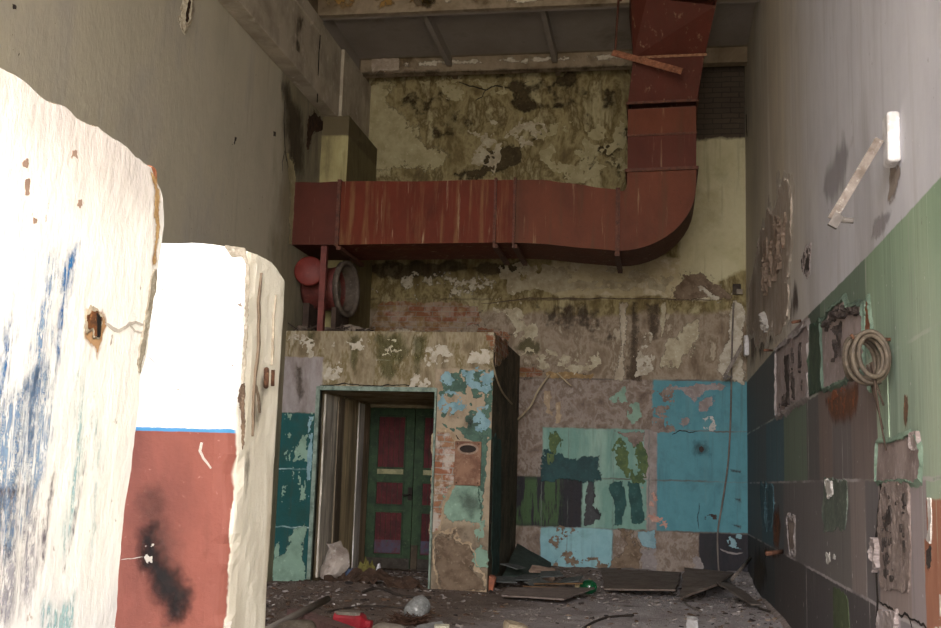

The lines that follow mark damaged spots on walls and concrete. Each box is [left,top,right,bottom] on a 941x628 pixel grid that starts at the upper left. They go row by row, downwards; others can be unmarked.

spalling [178,0,193,35]
leakage [401,59,482,75]
leakage [497,54,622,113]
leakage [401,92,450,114]
leakage [454,145,522,180]
crack [105,321,144,334]
flaking render [287,169,874,592]
crack [874,484,882,537]
flaking render [867,429,923,594]
crack [875,573,927,628]
flaking render [875,609,899,628]